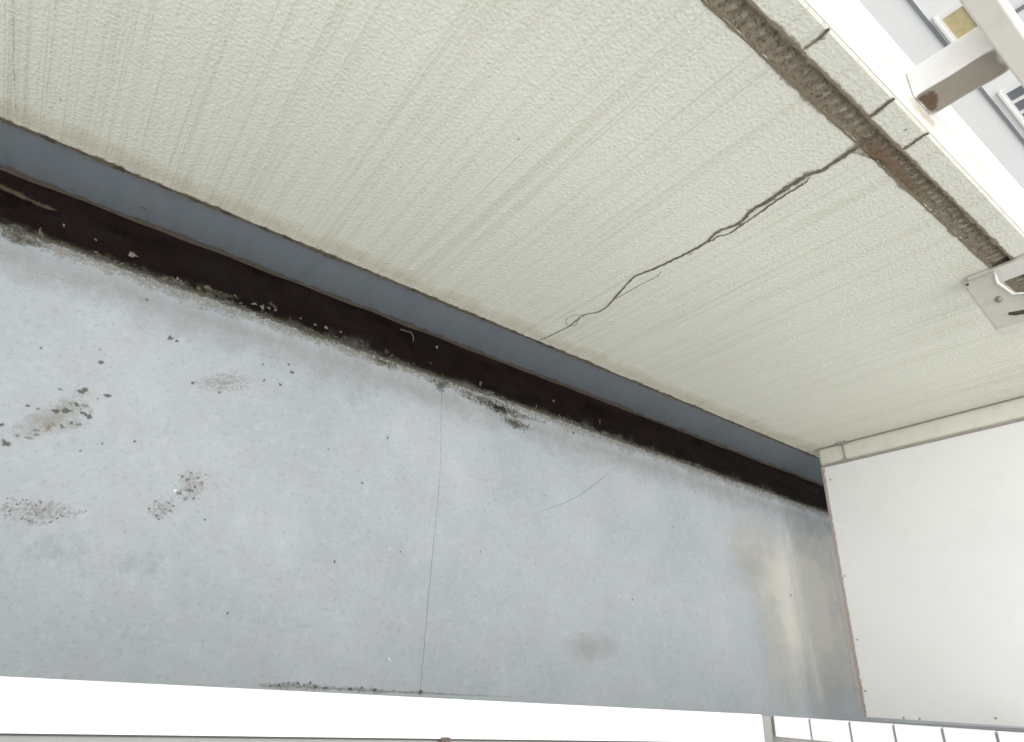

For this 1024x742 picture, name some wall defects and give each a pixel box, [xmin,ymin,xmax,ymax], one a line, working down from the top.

damp [0,166,824,486]
crack [541,97,895,340]